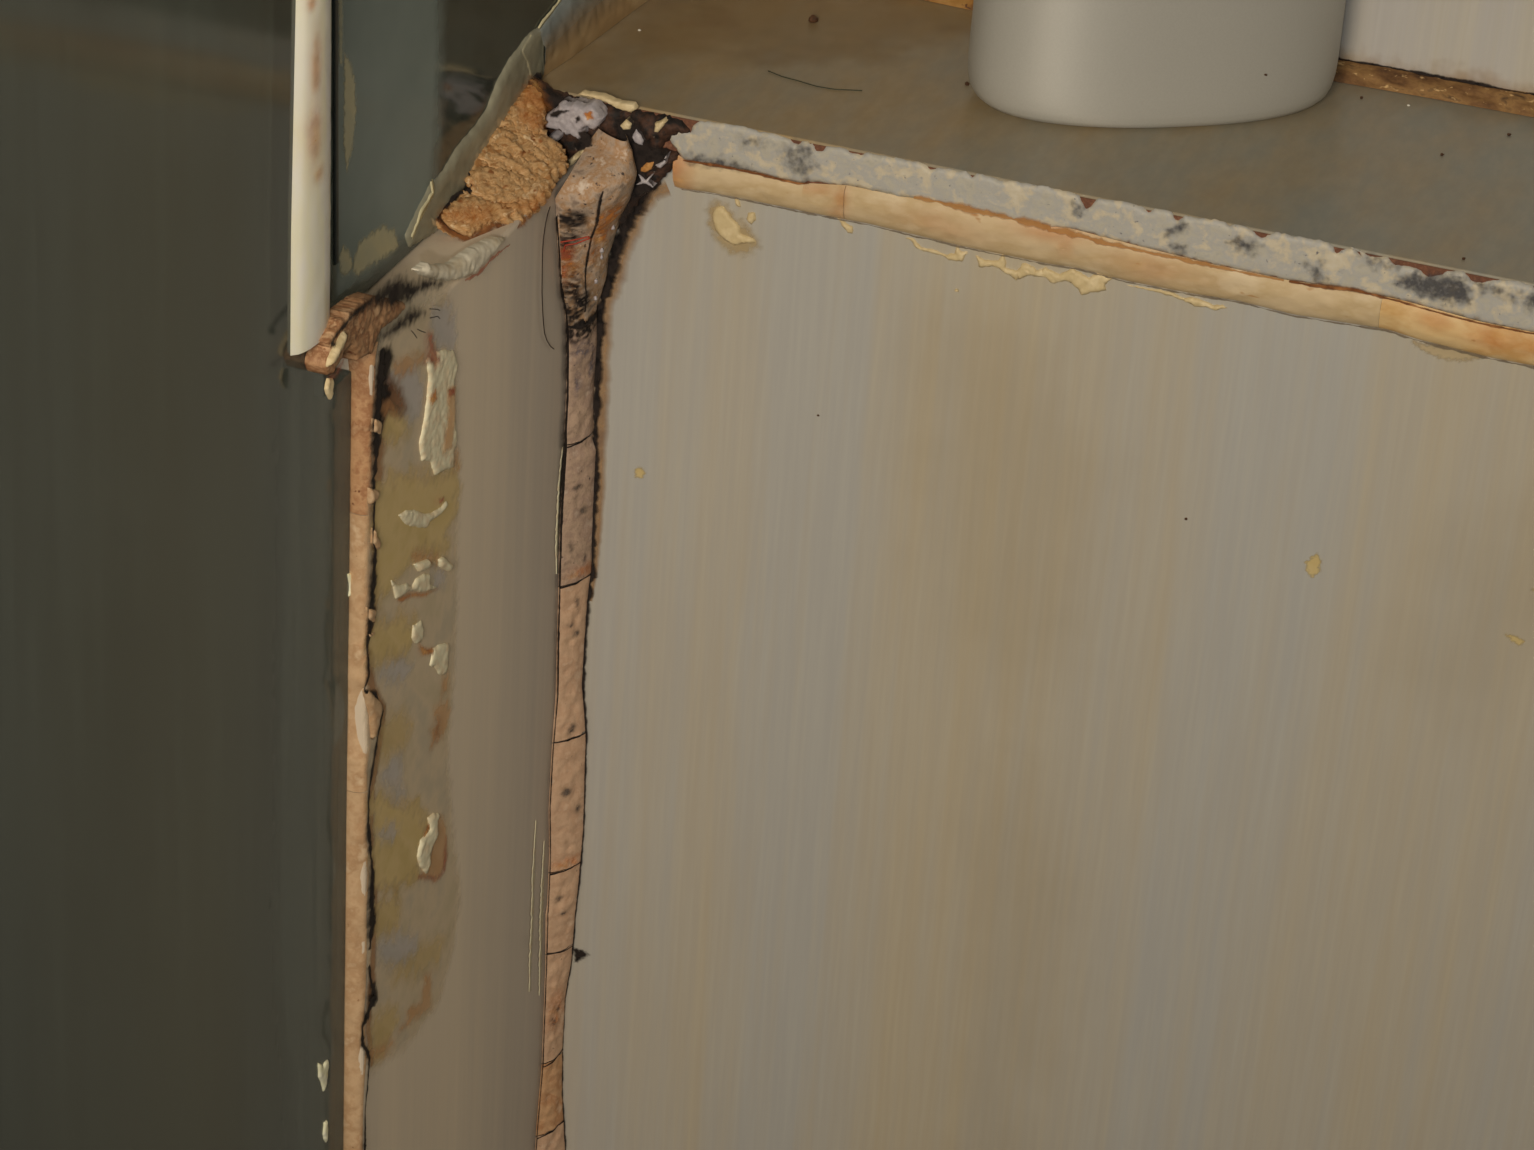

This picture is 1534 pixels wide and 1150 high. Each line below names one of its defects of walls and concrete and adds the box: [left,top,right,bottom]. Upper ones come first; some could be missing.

peeling [546,96,608,151]
peeling [670,121,1534,332]
crack [568,191,603,330]
peeling [370,418,382,434]
peeling [419,349,458,475]
peeling [398,497,448,528]
peeling [391,557,454,601]
peeling [411,620,449,675]
peeling [362,688,383,740]
crack [360,347,387,1150]
peeling [417,813,440,874]